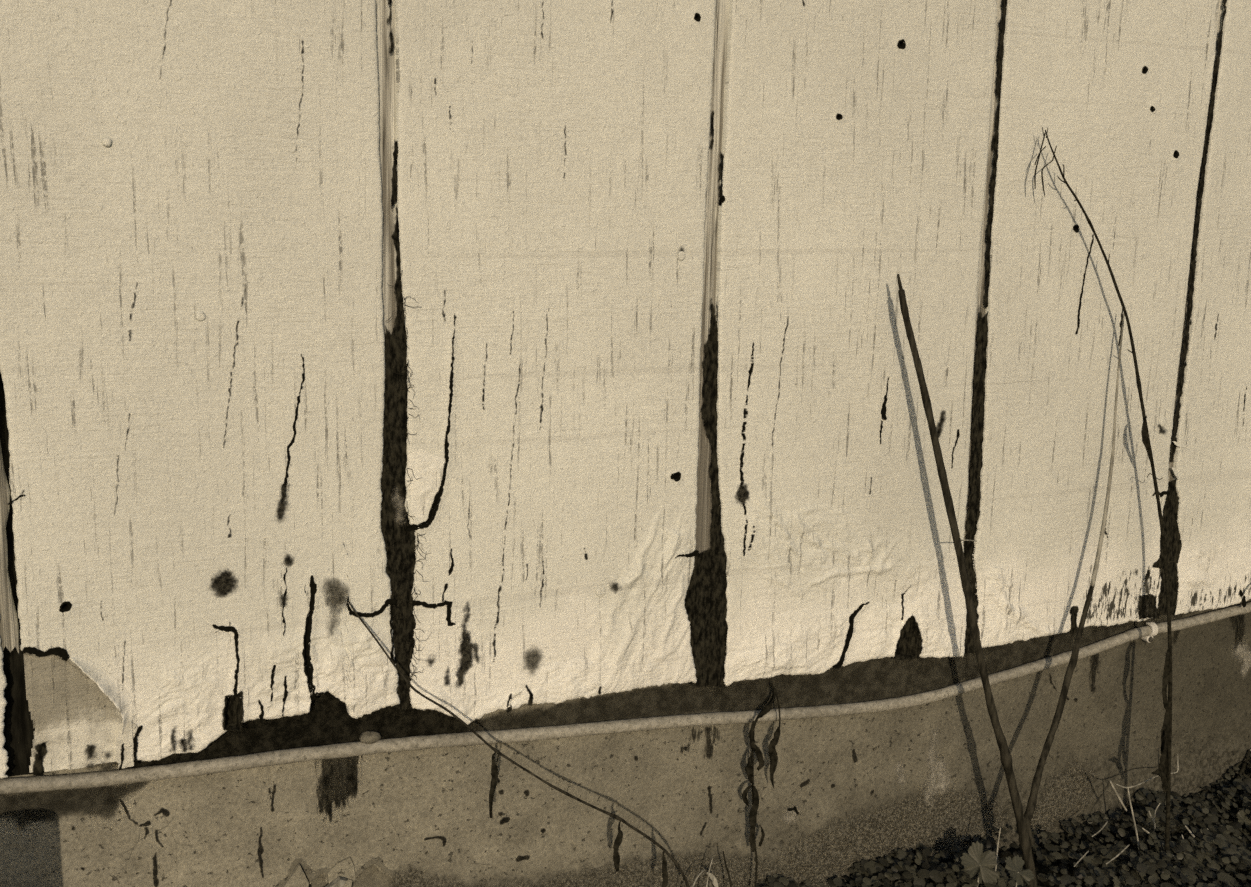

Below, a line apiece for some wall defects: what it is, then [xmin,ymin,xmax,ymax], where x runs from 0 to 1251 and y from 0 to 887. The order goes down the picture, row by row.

crack [223,298,243,448]
crack [277,354,305,520]
crack [405,291,548,660]
leakage [127,0,1183,769]
crack [1152,490,1170,498]
peeling [22,647,142,773]
crack [212,555,329,724]
leakage [323,762,357,821]
crack [346,513,470,664]
crack [834,602,869,669]
leakage [926,731,949,806]
leakage [1235,643,1251,675]